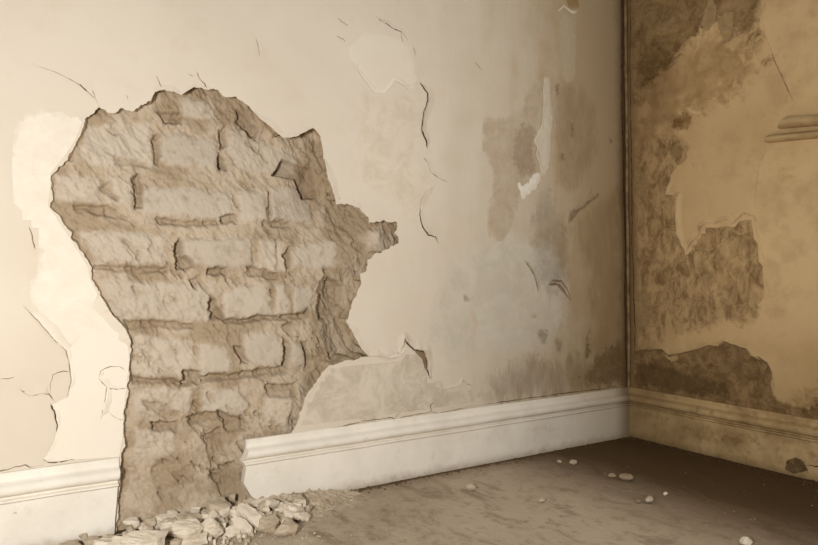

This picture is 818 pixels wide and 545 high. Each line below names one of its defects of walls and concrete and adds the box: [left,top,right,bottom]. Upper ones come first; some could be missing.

spalling [12,83,477,531]
crack [334,0,636,428]
water stain [426,82,571,364]
peeling [518,76,553,199]
peeling [632,130,818,420]